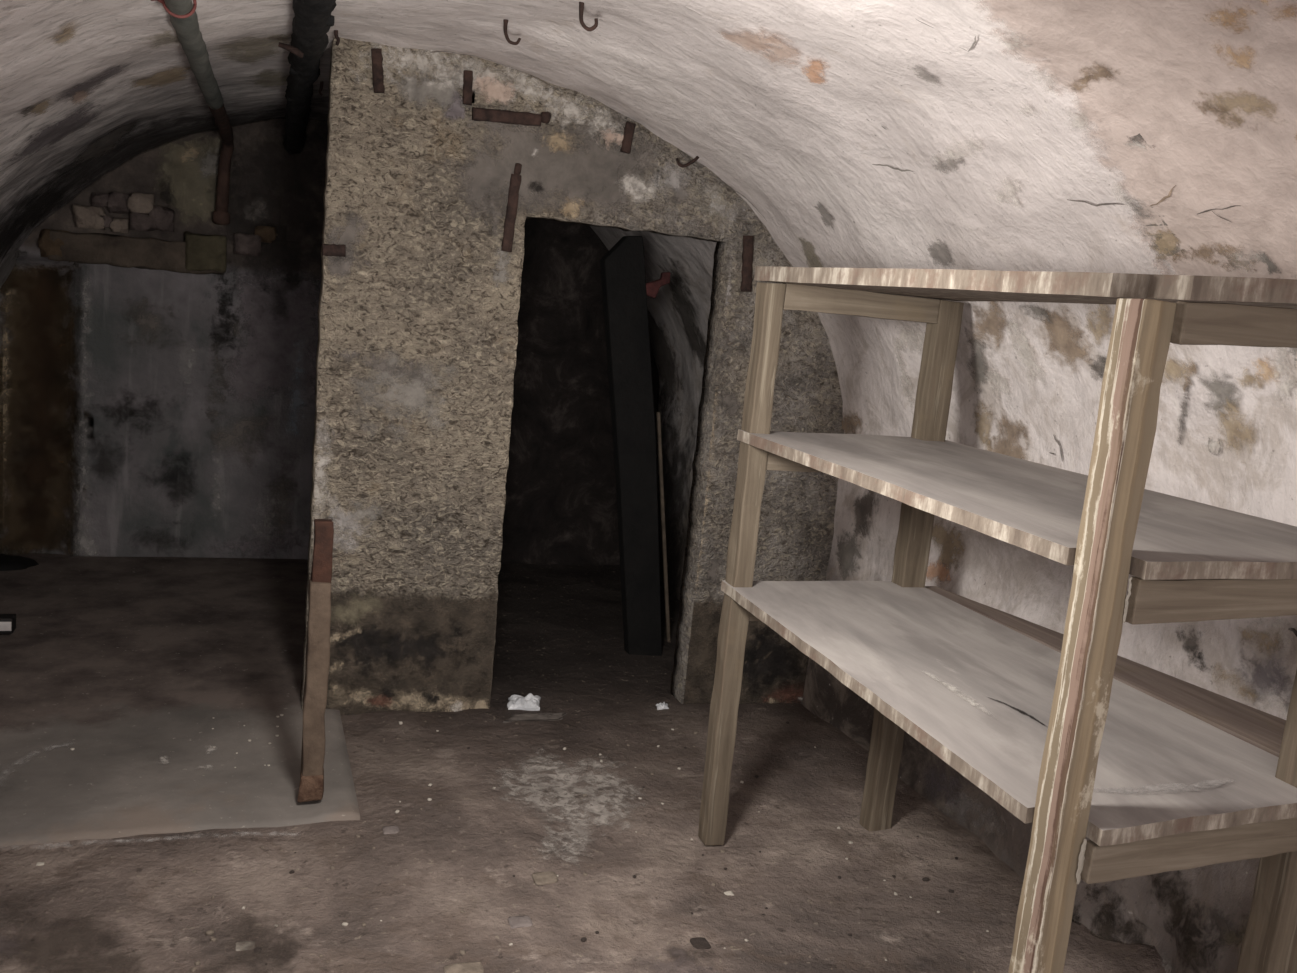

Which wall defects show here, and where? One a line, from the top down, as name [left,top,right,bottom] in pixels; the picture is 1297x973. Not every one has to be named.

spalling [721,33,824,84]
peeling [983,0,1297,279]
crack [1067,185,1176,206]
crack [1198,205,1239,222]
rust [0,262,89,555]
damp [207,278,268,510]
damp [1178,376,1253,449]
damp [326,588,498,715]
damp [1072,889,1144,945]
damp [1151,872,1245,973]